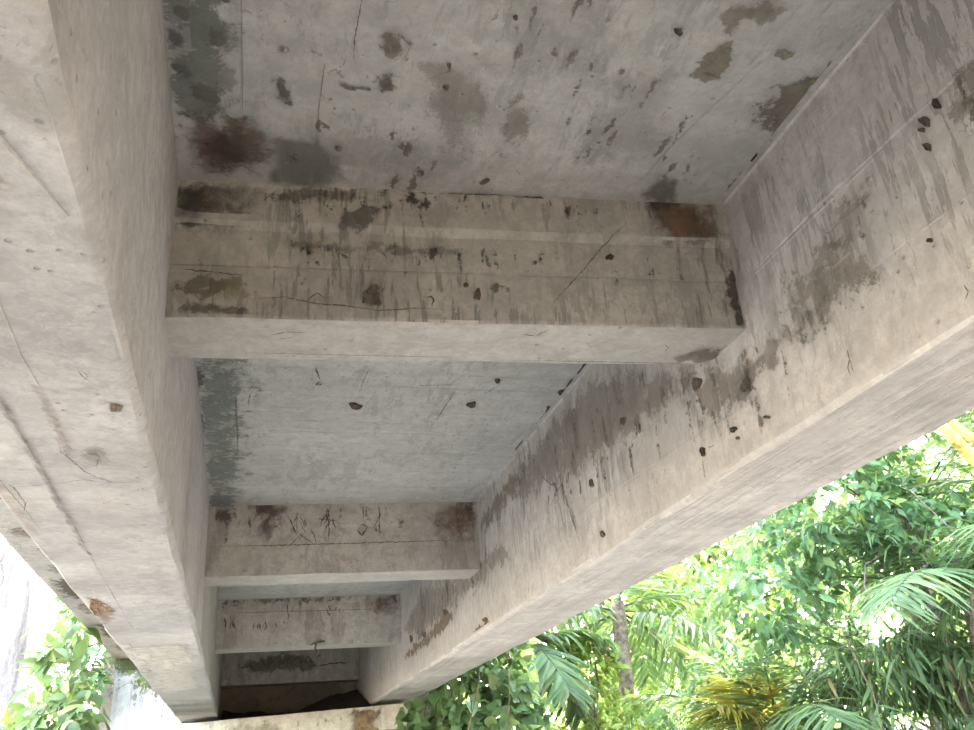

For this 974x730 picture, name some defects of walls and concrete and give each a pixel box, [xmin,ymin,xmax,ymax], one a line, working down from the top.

water stain [162,0,245,126]
rust [194,117,272,173]
spalling [917,98,942,151]
rust [650,202,716,245]
water stain [780,195,880,344]
water stain [675,349,719,363]
water stain [741,347,763,427]
water stain [197,358,260,540]
crack [0,444,147,536]
spalling [89,598,114,621]
rust [350,709,381,730]